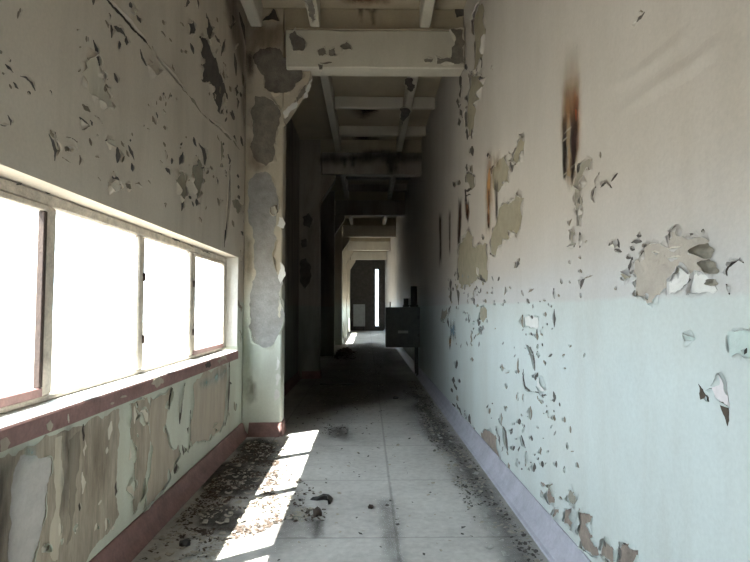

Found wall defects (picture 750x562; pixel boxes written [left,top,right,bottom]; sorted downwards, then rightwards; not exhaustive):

peeling [78,36,120,130]
peeling [89,133,135,172]
crack [107,0,240,247]
peeling [160,137,228,211]
flaking render [180,0,314,400]
peeling [440,132,525,347]
corrosion [563,86,578,180]
peeling [608,224,718,308]
peeling [450,269,593,473]
peeling [698,372,730,426]
peeling [0,377,181,562]
peeling [540,482,640,562]